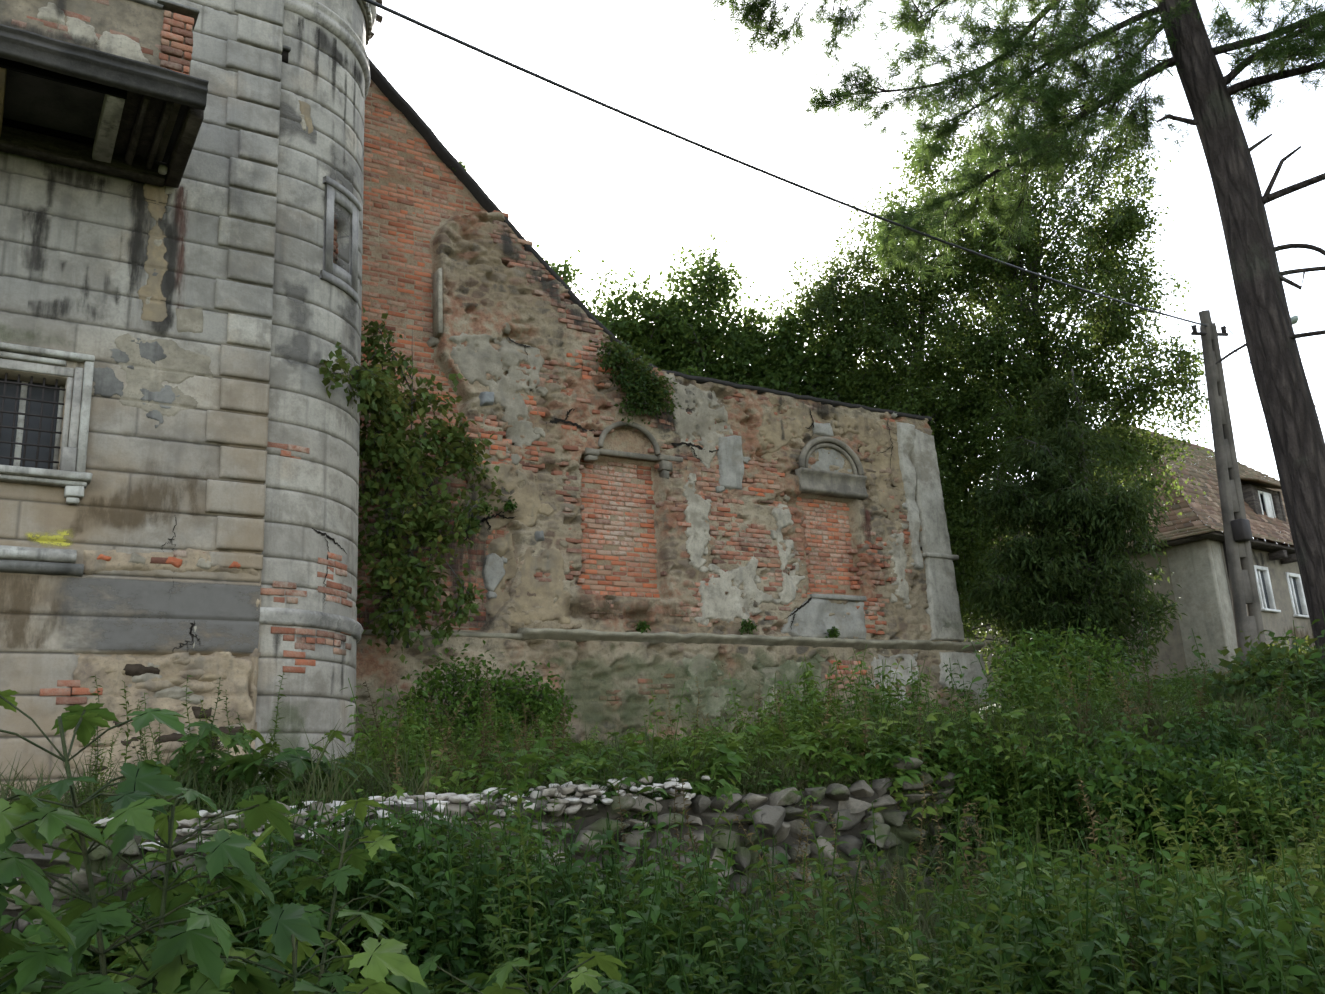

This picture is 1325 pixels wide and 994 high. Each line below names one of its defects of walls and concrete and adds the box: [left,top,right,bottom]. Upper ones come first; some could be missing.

water stain [281,104,317,143]
water stain [316,29,362,122]
water stain [29,163,105,270]
water stain [116,181,178,334]
peeling [137,183,174,322]
peeling [93,333,213,428]
peeling [426,268,586,630]
crack [161,517,177,591]
crack [312,528,347,609]
peeling [638,373,924,727]
crack [172,620,201,653]
spalling [40,647,261,796]